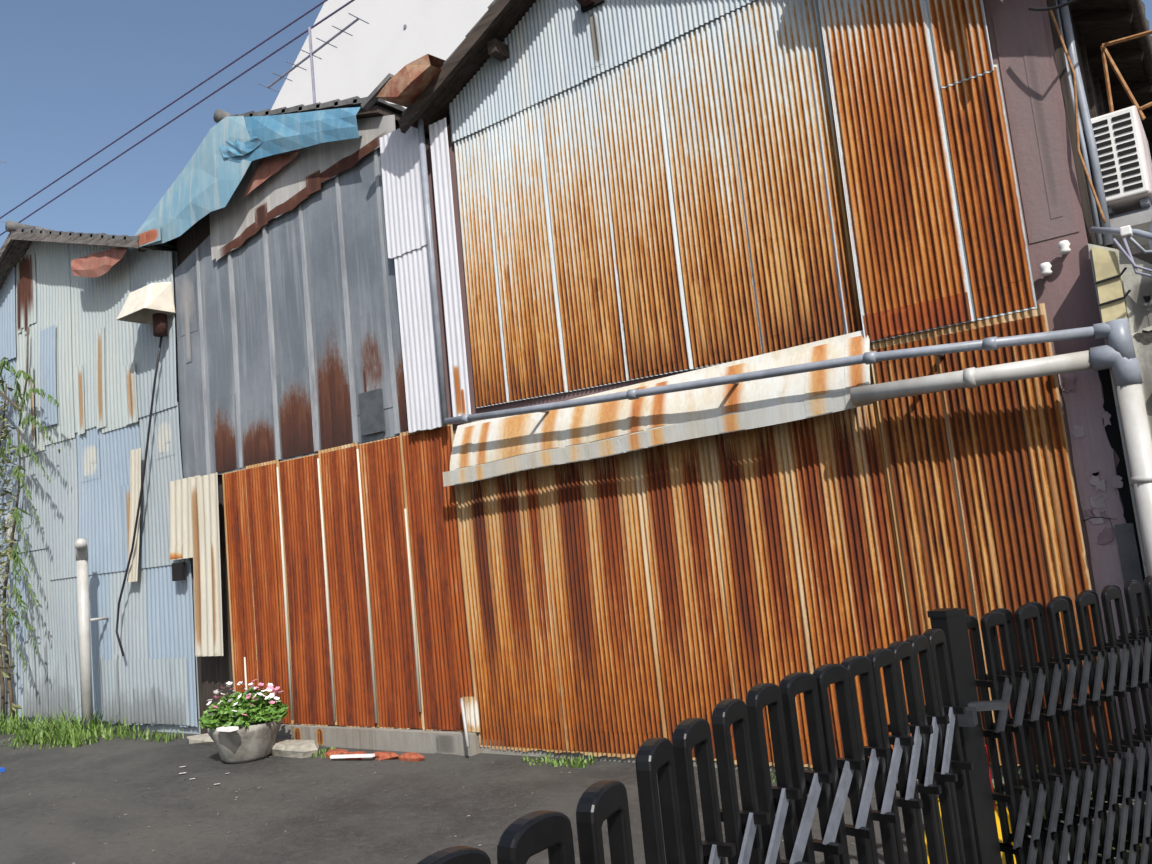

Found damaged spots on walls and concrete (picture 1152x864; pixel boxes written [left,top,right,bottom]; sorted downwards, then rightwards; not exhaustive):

rust [16,254,36,334]
rust [76,326,106,435]
rust [123,362,138,425]
rust [170,0,1098,764]
peeling [1058,369,1151,662]
rust [1026,682,1114,768]
peeling [1114,680,1152,760]